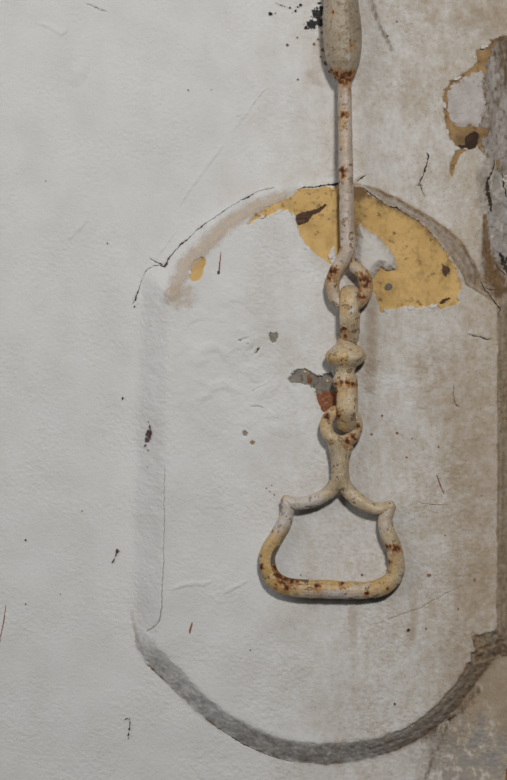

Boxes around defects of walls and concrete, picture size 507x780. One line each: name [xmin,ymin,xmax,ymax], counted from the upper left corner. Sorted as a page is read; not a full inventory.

flaking render [441,36,507,182]
peeling [188,257,206,281]
crack [132,187,274,305]
peeling [246,185,340,264]
peeling [352,186,461,314]
flaking render [288,369,337,412]